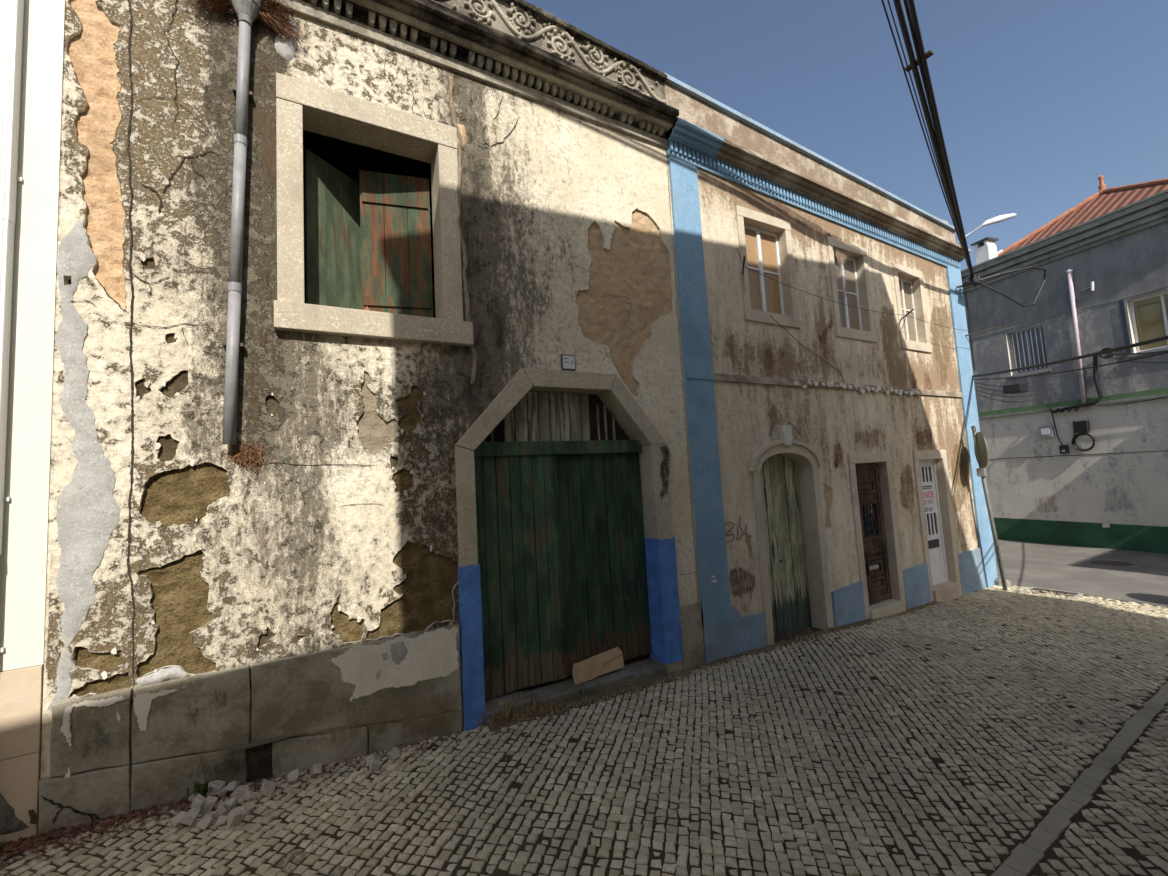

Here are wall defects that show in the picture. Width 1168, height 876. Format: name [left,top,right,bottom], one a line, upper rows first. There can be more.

flaking render [66,0,126,310]
crack [70,0,222,682]
flaking render [575,208,674,396]
water stain [880,305,950,390]
flaking render [139,434,230,528]
flaking render [355,370,426,496]
water stain [834,444,843,467]
water stain [917,430,932,446]
water stain [952,436,971,511]
flaking render [60,548,216,747]
flaking render [330,539,459,702]
water stain [729,567,755,598]